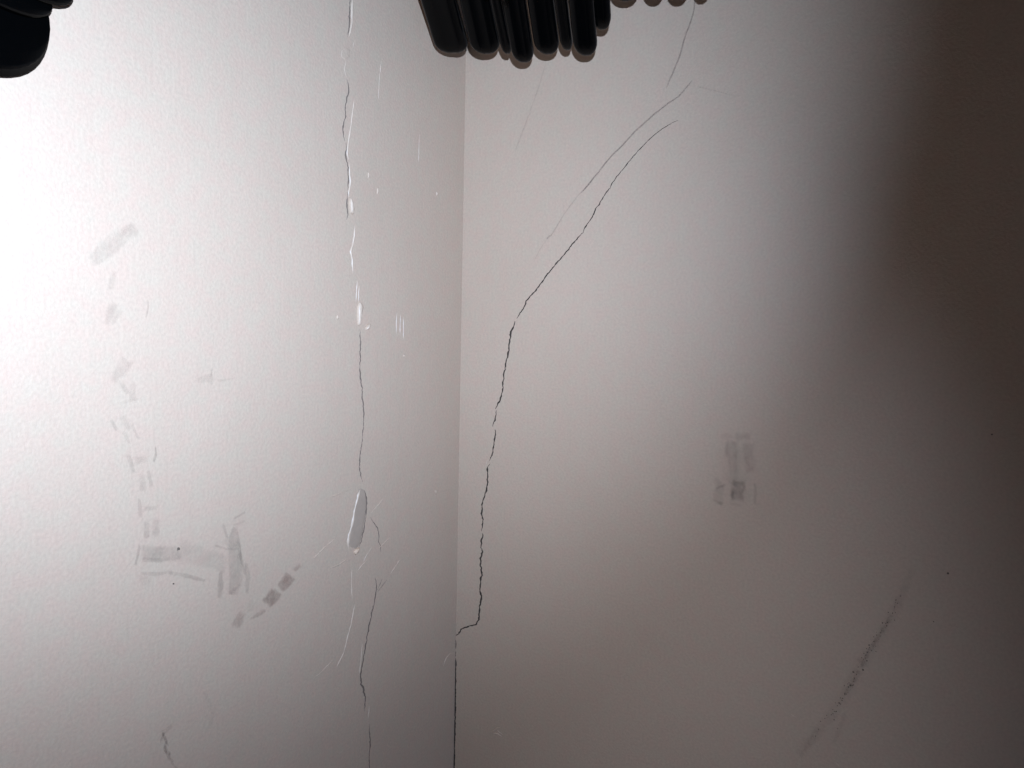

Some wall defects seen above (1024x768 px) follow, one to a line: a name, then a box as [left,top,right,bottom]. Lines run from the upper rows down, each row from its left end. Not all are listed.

crack [341,0,360,302]
peeling [349,489,366,549]
crack [347,337,381,555]
crack [454,120,678,768]
crack [359,579,387,768]